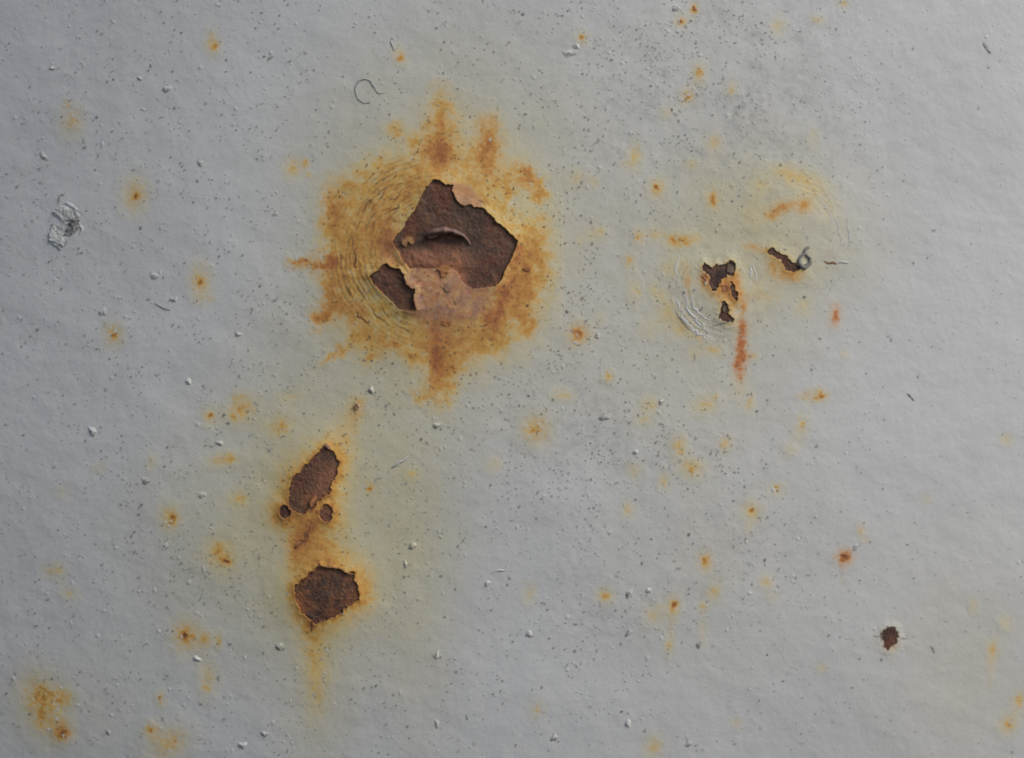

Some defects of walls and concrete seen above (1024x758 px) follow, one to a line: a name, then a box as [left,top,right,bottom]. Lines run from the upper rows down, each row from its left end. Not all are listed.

corrosion [151,75,613,744]